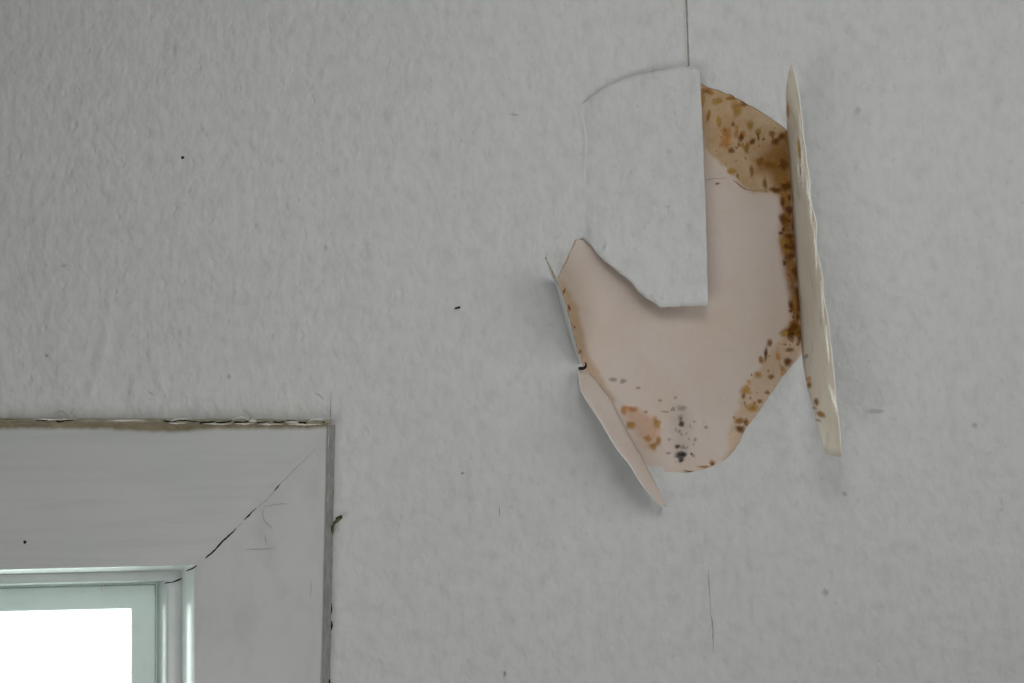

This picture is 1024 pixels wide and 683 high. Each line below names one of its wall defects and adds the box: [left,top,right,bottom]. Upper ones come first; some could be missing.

leakage [702,86,811,432]
crack [2,410,75,423]
crack [107,393,334,584]
crack [310,543,333,644]